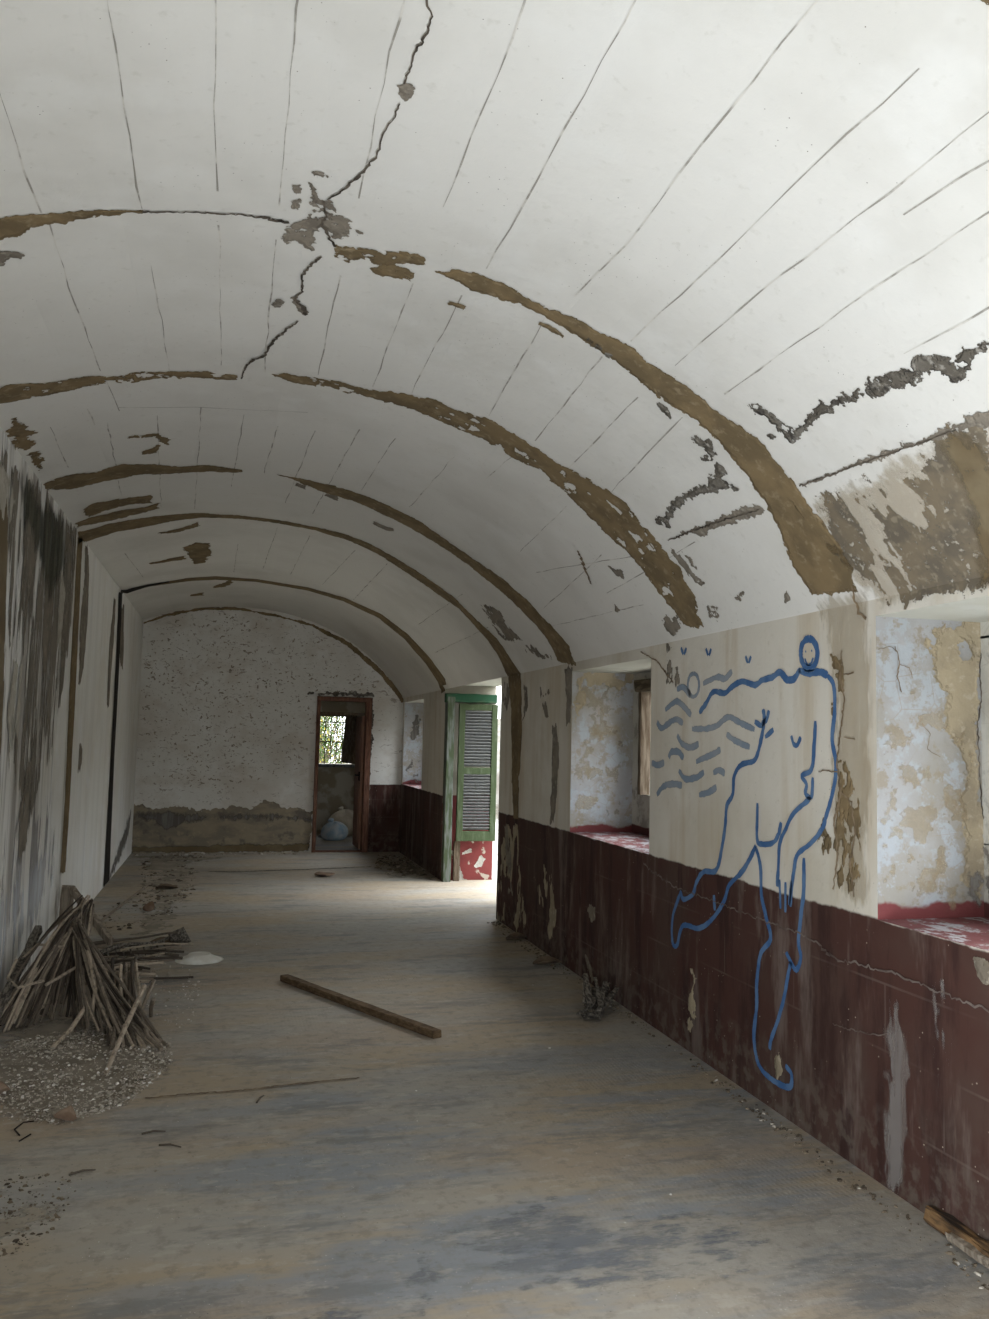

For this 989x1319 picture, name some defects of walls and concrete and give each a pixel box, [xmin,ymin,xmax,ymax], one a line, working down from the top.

spalling [0,210,144,266]
crack [142,0,433,379]
peeling [397,83,415,102]
spalling [271,171,989,687]
leakage [0,499,9,754]
spalling [0,371,634,942]
leakage [110,811,313,877]
peeling [973,957,989,985]